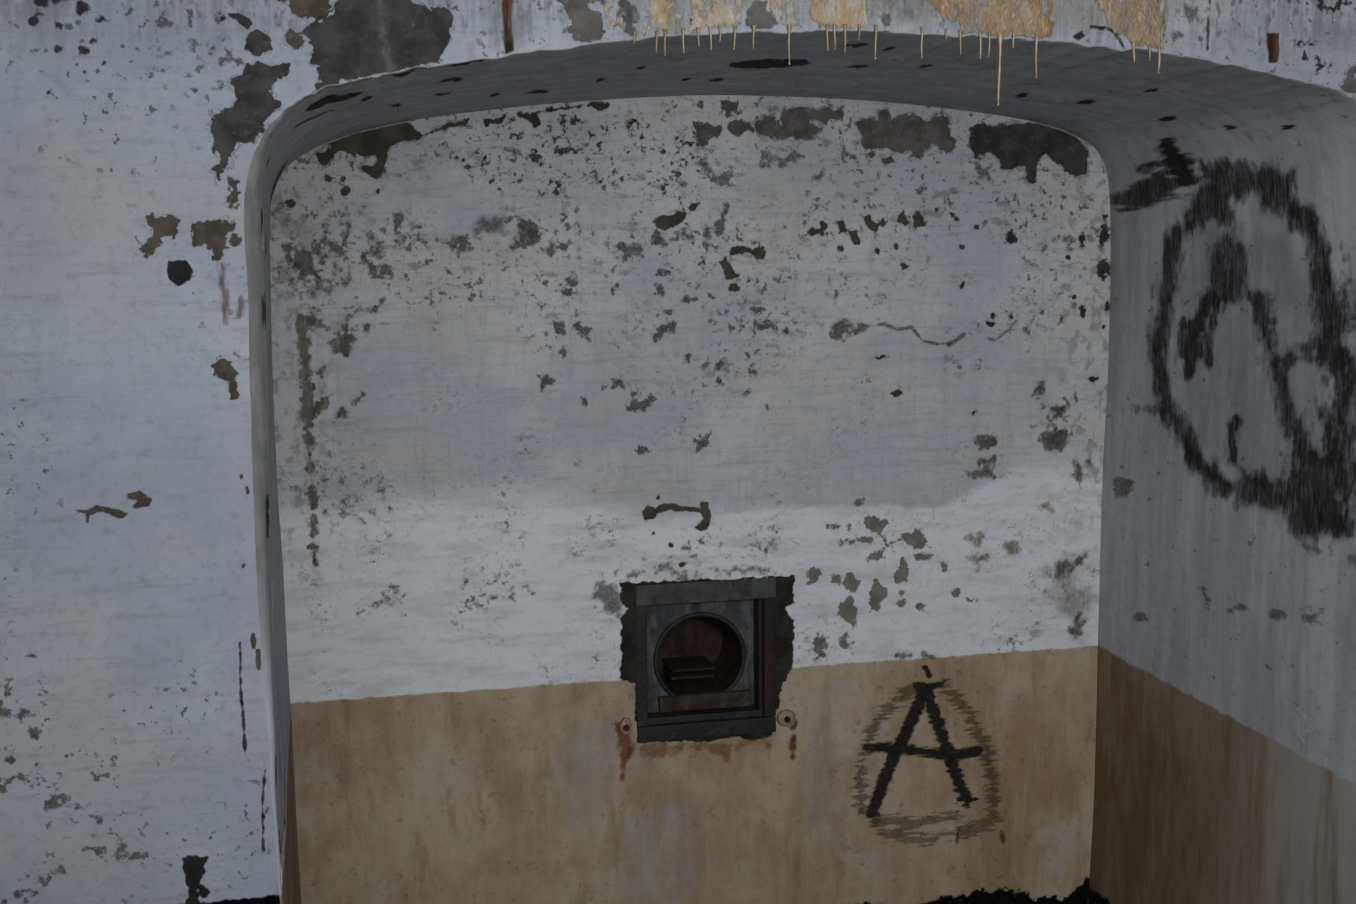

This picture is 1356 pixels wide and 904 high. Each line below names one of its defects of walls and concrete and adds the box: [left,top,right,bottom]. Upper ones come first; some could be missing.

corrosion [502,0,514,53]
peeling [135,0,484,261]
peeling [313,90,610,196]
peeling [692,100,1094,185]
crack [857,323,1009,347]
corrosion [616,723,770,779]